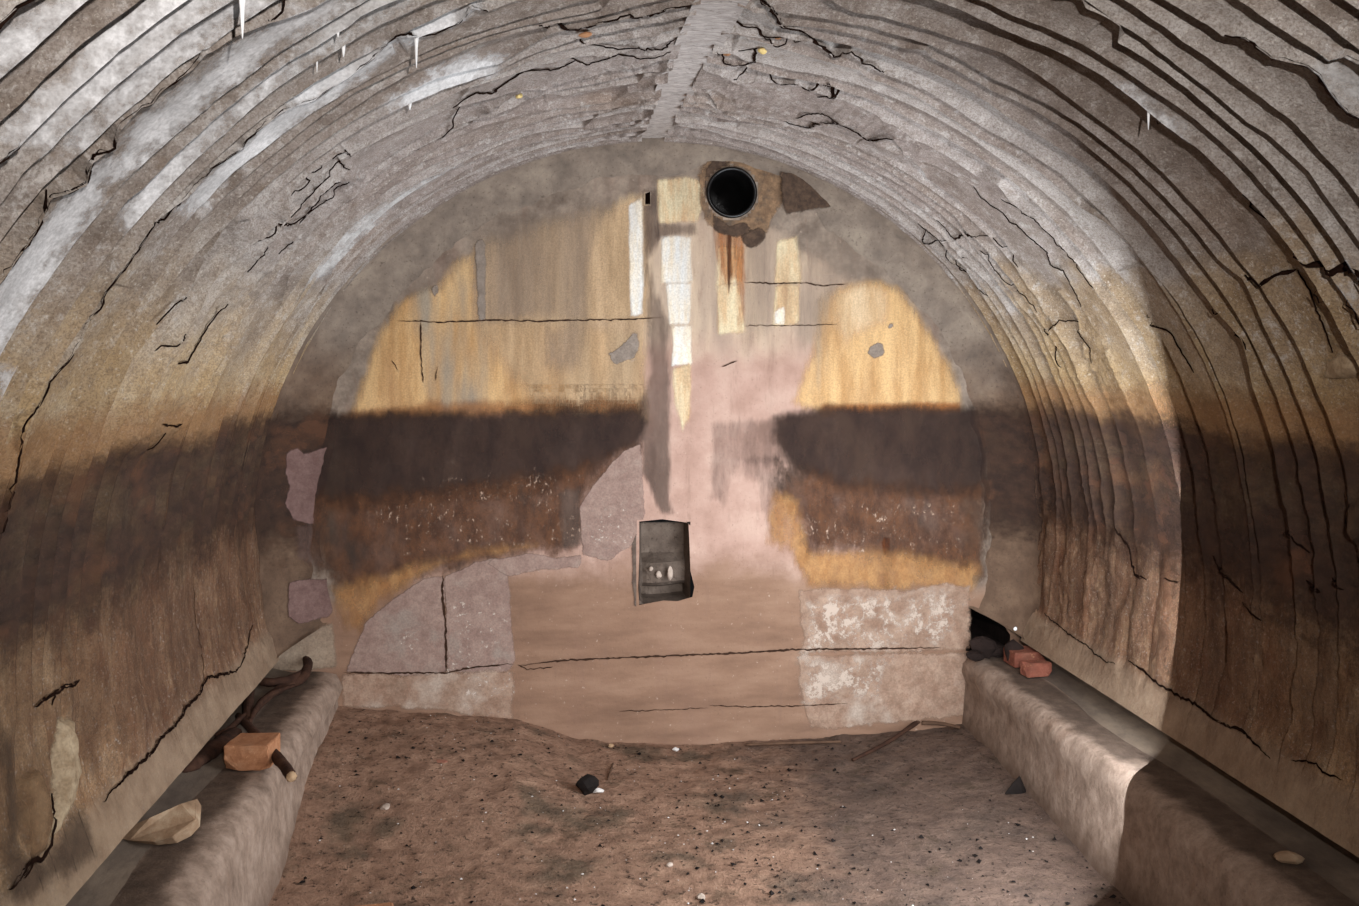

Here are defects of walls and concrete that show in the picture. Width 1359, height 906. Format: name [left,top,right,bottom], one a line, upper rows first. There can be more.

spalling [445,17,690,129]
spalling [694,54,953,169]
spalling [98,153,379,462]
rust [718,233,743,286]
crack [1244,253,1359,353]
damp [0,176,701,751]
damp [775,283,1359,660]
crack [104,625,253,802]
peeling [273,444,645,719]
crack [343,576,939,675]
crack [1044,613,1341,780]
damp [2,742,92,895]